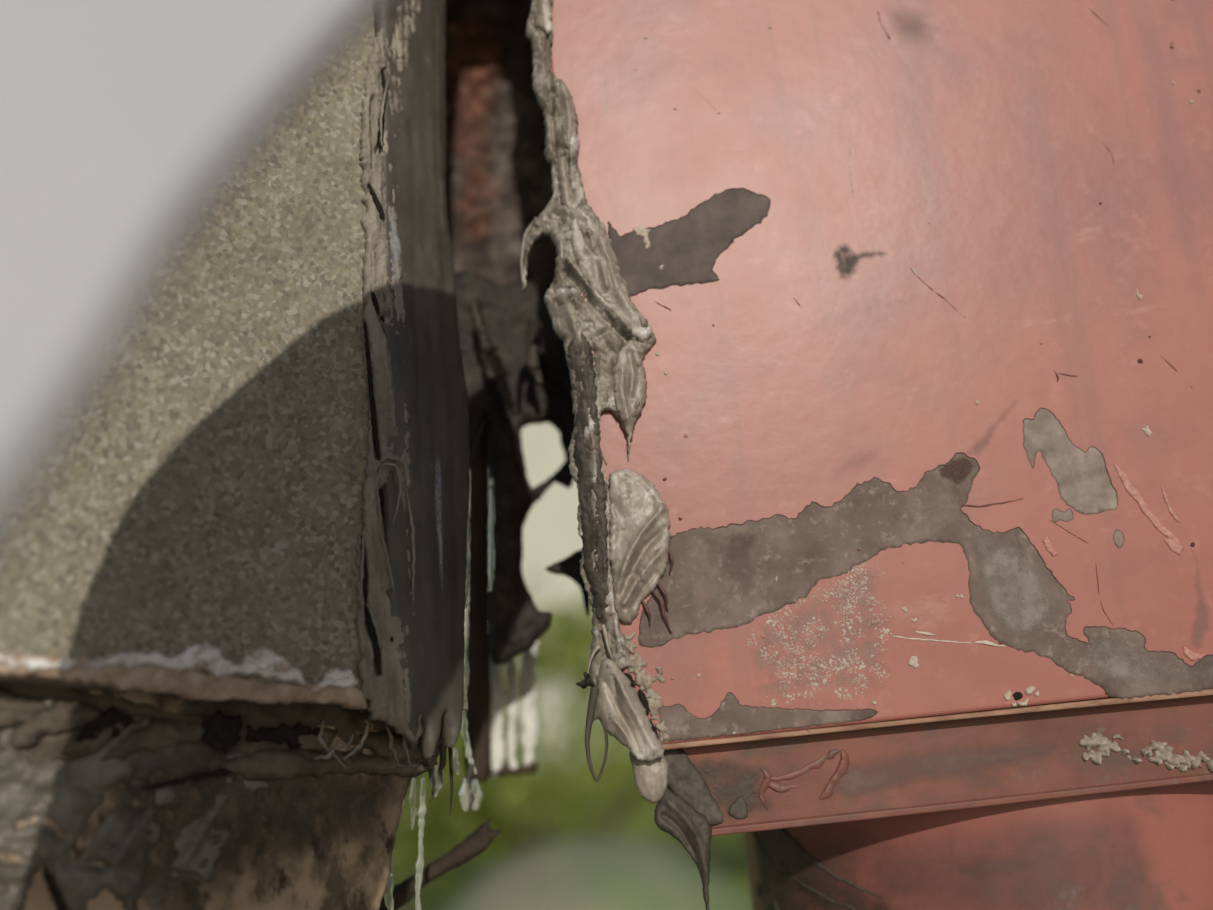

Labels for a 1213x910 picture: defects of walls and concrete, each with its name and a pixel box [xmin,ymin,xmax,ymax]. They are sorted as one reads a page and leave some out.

peeling [607,187,771,296]
peeling [1023,408,1195,555]
peeling [638,452,1213,699]
efflorescence [0,643,357,691]
spalling [0,653,368,710]
peeling [658,692,878,742]
hole [1003,686,1039,707]